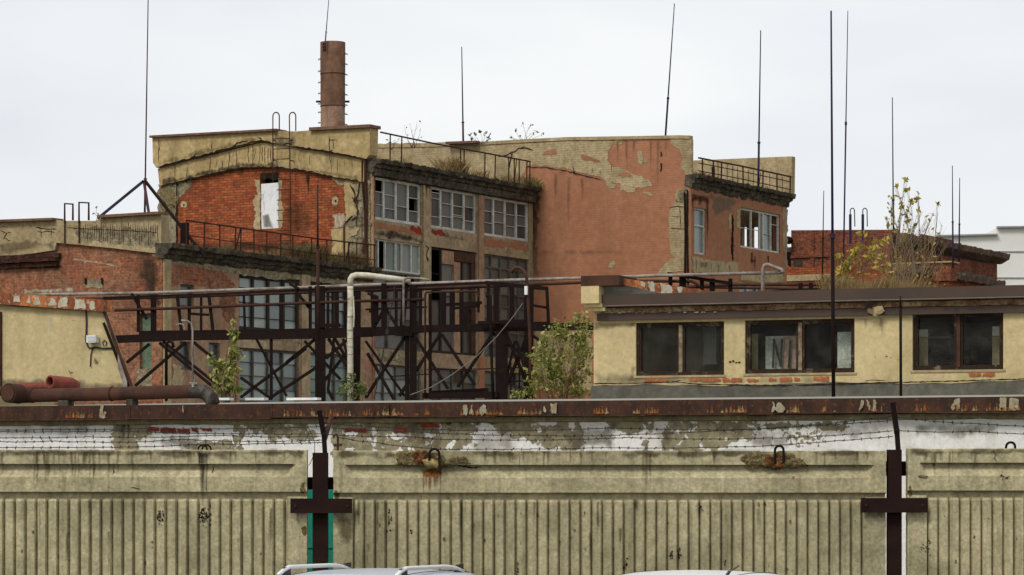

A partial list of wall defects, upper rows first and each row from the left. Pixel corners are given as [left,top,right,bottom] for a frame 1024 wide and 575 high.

crack [36,137,364,246]
peeling [376,140,652,196]
peeling [670,138,692,175]
spalling [347,181,464,254]
peeling [658,188,789,283]
peeling [111,424,316,450]
peeling [491,422,586,451]
peeling [606,421,849,469]
corrosion [423,470,441,485]